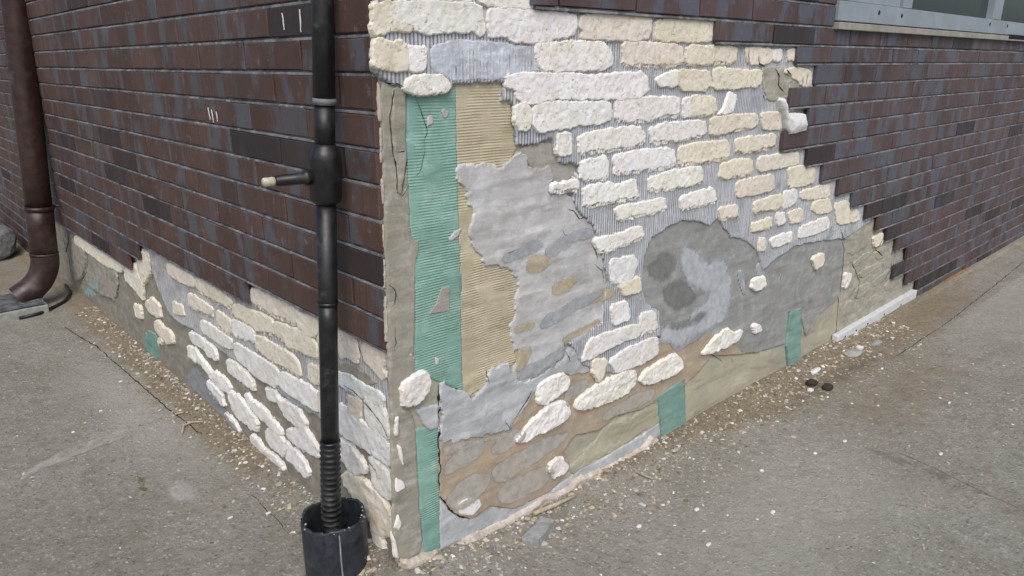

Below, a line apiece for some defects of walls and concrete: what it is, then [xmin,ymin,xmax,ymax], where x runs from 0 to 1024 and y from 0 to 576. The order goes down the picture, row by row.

crack [379,80,428,196]
flaking render [71,238,119,302]
spalling [141,248,320,418]
spalling [338,329,391,467]
crack [437,384,470,519]
spalling [367,0,915,570]